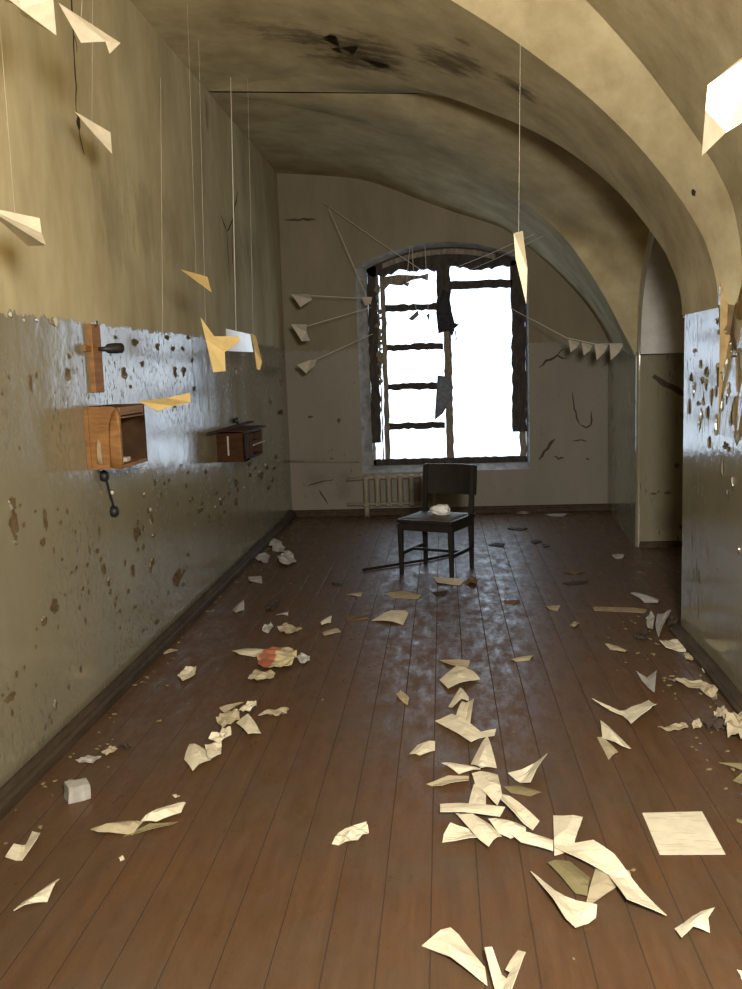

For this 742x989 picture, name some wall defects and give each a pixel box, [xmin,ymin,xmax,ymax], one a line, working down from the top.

crack [71,0,85,155]
peeling [156,335,194,378]
peeling [652,287,742,498]